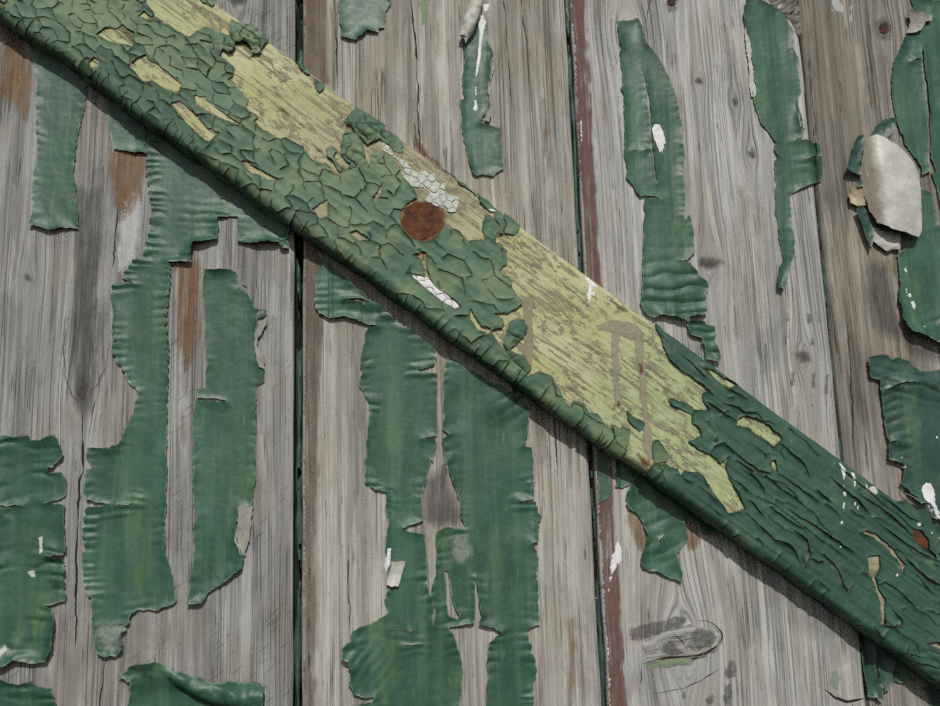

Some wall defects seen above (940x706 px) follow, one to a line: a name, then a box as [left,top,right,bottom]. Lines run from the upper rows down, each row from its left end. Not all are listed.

peeling [0,433,67,667]
peeling [81,98,290,657]
crack [0,0,645,462]
crack [345,560,353,627]
peeling [314,250,541,706]
peeling [612,13,721,362]
peeling [743,0,823,289]
crack [638,321,940,694]
crack [807,30,820,221]
crack [824,689,864,706]
peeling [847,0,940,342]
peeling [868,354,940,519]